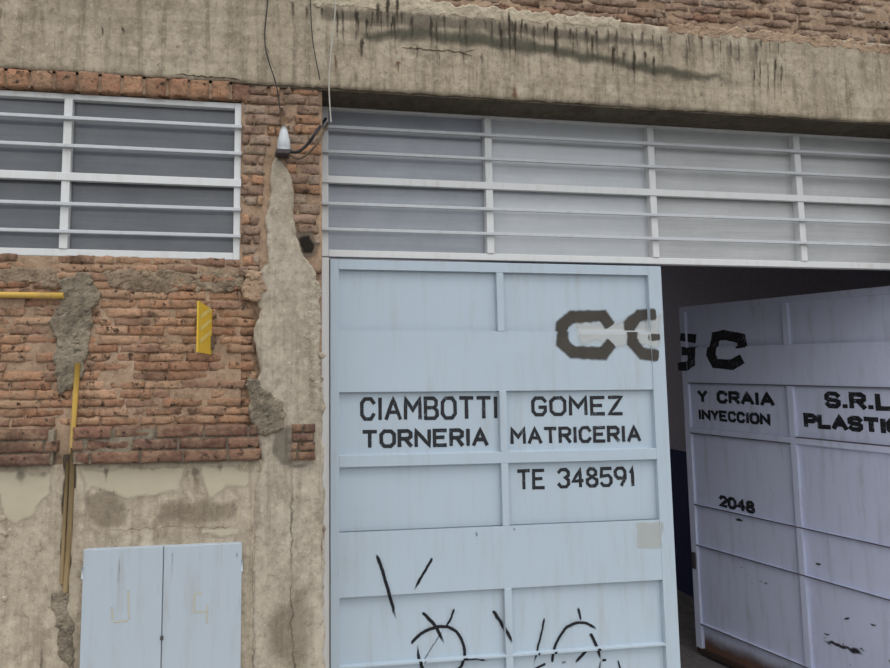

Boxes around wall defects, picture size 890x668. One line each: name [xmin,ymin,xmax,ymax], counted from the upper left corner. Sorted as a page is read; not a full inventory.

leakage [336,0,413,54]
leakage [484,13,558,62]
leakage [569,27,671,74]
spalling [0,85,322,395]
spalling [303,279,326,415]
spalling [246,377,286,436]
spalling [51,592,75,668]